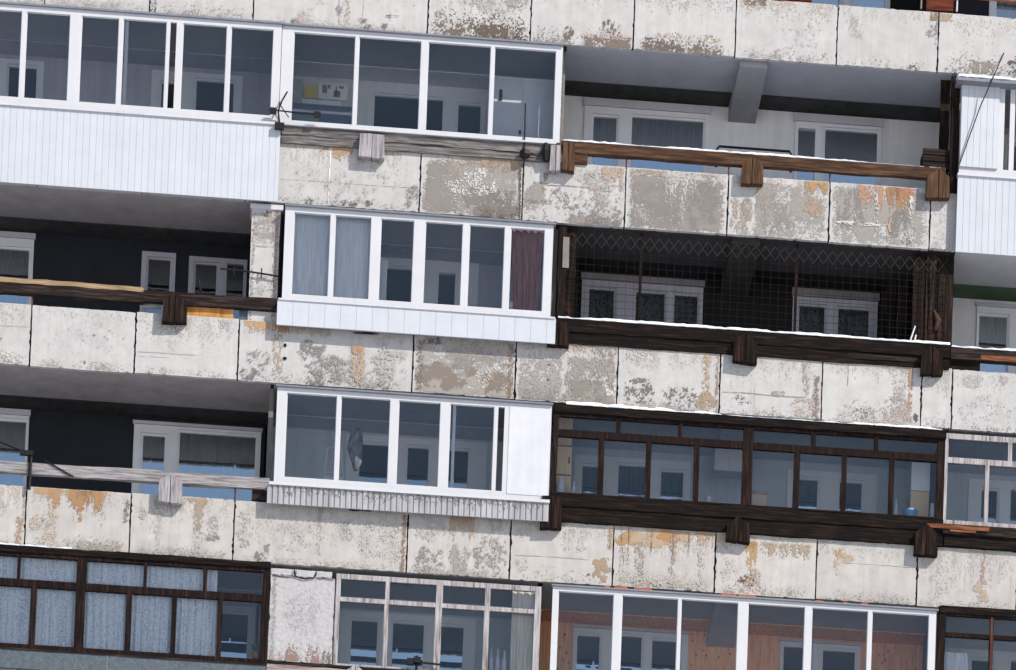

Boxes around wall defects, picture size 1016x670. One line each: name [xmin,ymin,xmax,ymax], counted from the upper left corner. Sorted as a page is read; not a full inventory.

spalling [430,6,529,41]
corrosion [858,185,918,244]
corrosion [14,487,110,545]
corrosion [592,528,731,582]
corrosion [744,539,854,589]
corrosion [969,549,992,606]